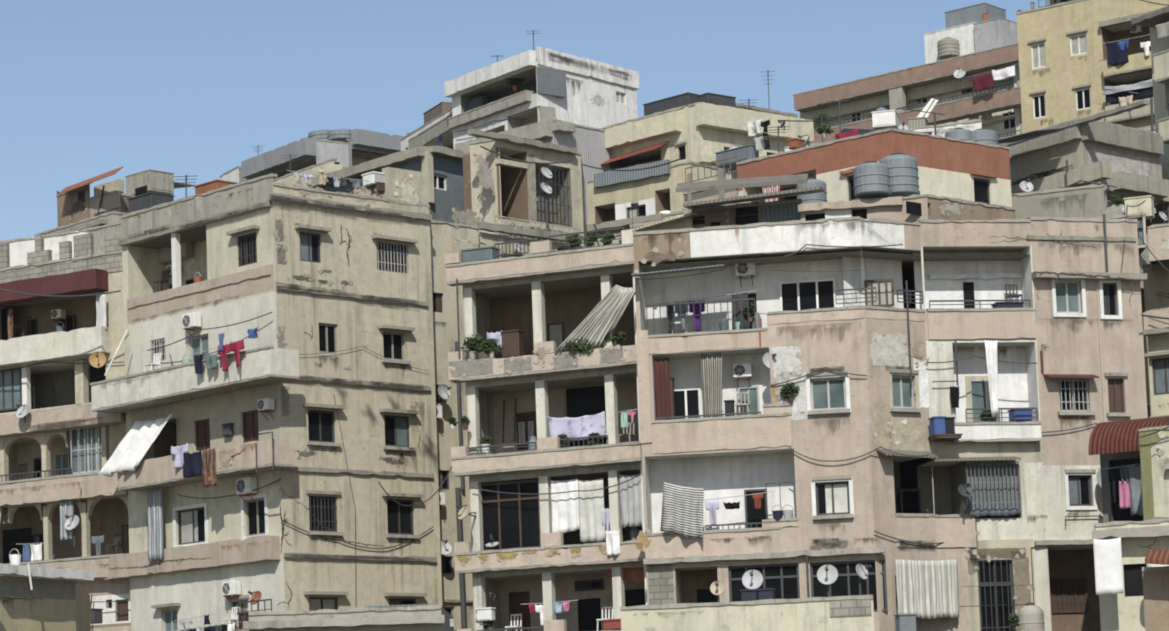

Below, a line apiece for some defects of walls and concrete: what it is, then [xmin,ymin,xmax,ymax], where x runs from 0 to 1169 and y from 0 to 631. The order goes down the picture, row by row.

crack [339,228,352,265]
peeling [771,346,809,420]
peeling [870,332,930,452]